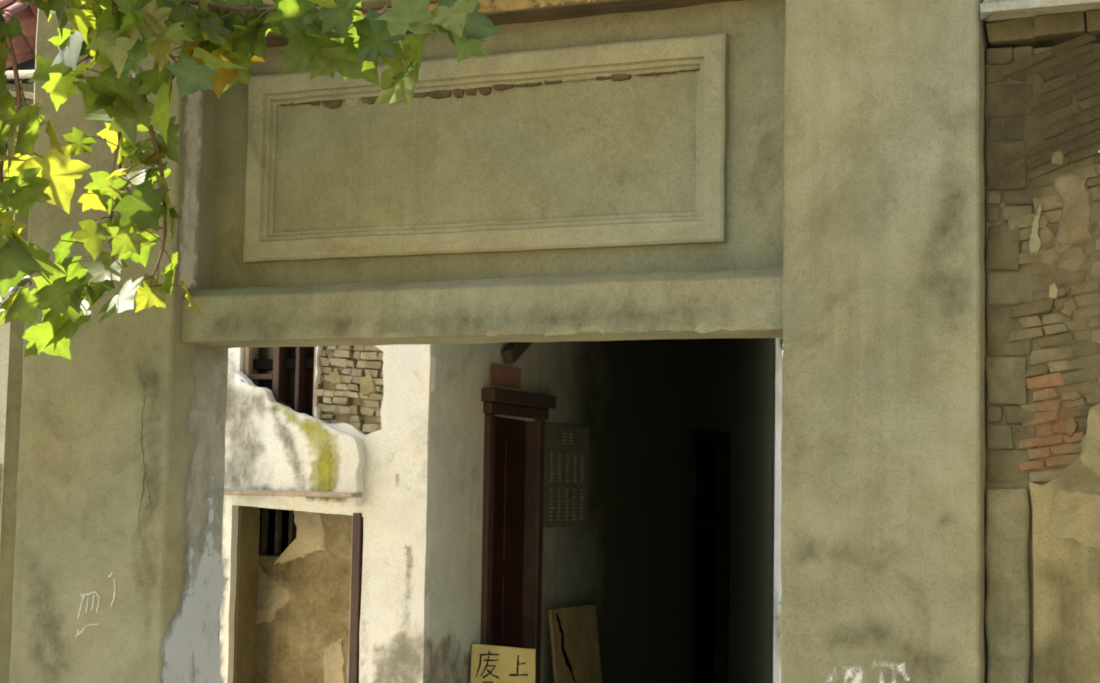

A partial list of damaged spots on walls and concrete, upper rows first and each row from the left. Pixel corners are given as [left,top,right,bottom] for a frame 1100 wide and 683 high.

flaking render [1001,32,1100,549]
spalling [545,324,635,336]
spalling [657,322,776,333]
flaking render [313,331,404,435]
water stain [307,445,342,501]
peeling [274,510,325,564]
peeling [257,565,290,624]
peeling [323,638,347,683]